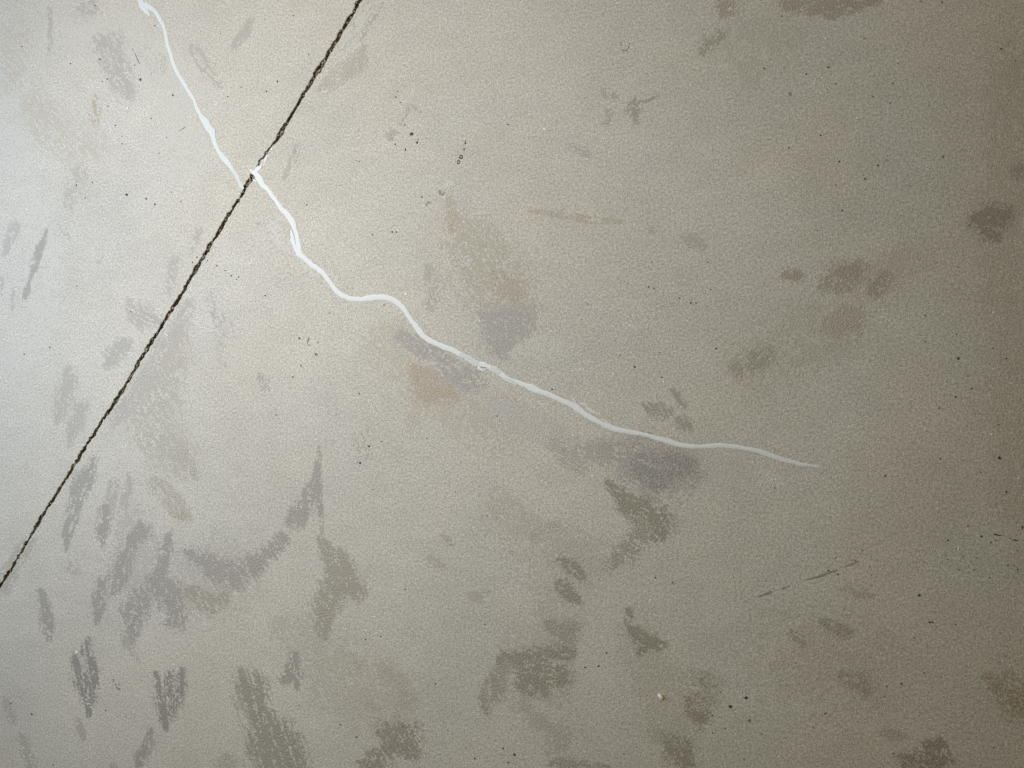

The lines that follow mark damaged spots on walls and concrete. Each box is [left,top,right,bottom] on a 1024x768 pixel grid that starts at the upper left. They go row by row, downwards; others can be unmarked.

crack [459,352,518,386]